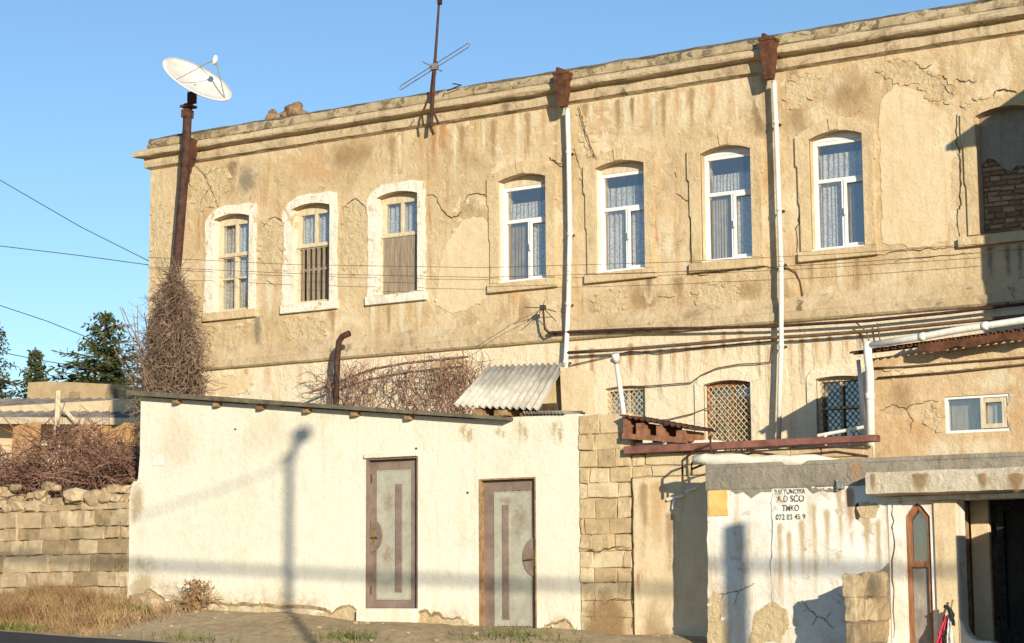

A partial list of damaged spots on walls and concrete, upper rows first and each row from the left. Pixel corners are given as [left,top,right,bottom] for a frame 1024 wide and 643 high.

damp [452,109,547,186]
peeling [875,55,991,248]
crack [881,62,1017,262]
crack [430,193,487,218]
damp [745,493,891,643]
flaking render [144,587,357,621]
flaking render [418,607,479,626]
damp [713,579,732,643]
flaking render [749,601,793,643]